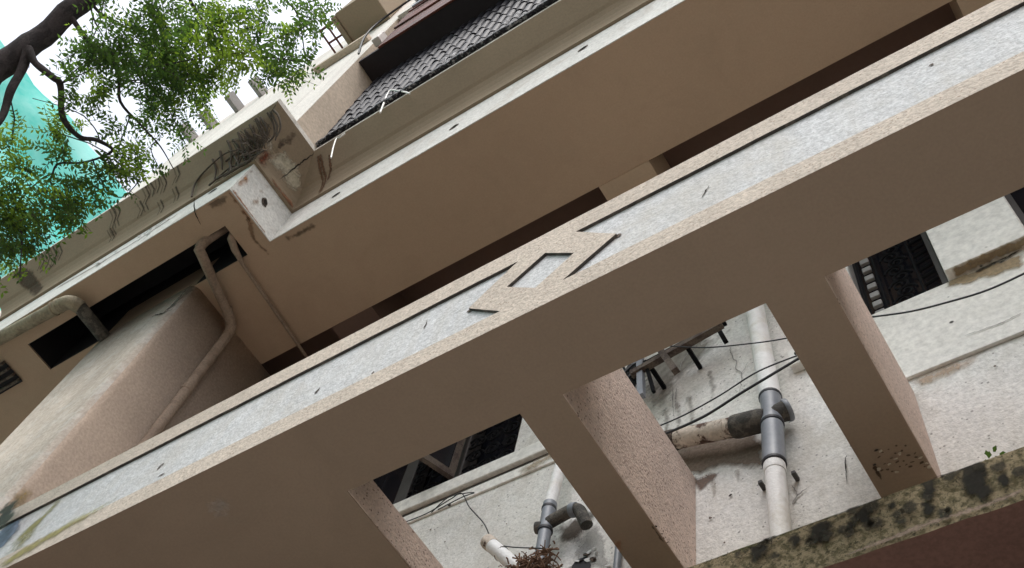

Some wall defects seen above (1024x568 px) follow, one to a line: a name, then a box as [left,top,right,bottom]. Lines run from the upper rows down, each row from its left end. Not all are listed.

water stain [949,237,1024,286]
water stain [677,435,762,490]
water stain [848,490,1021,555]